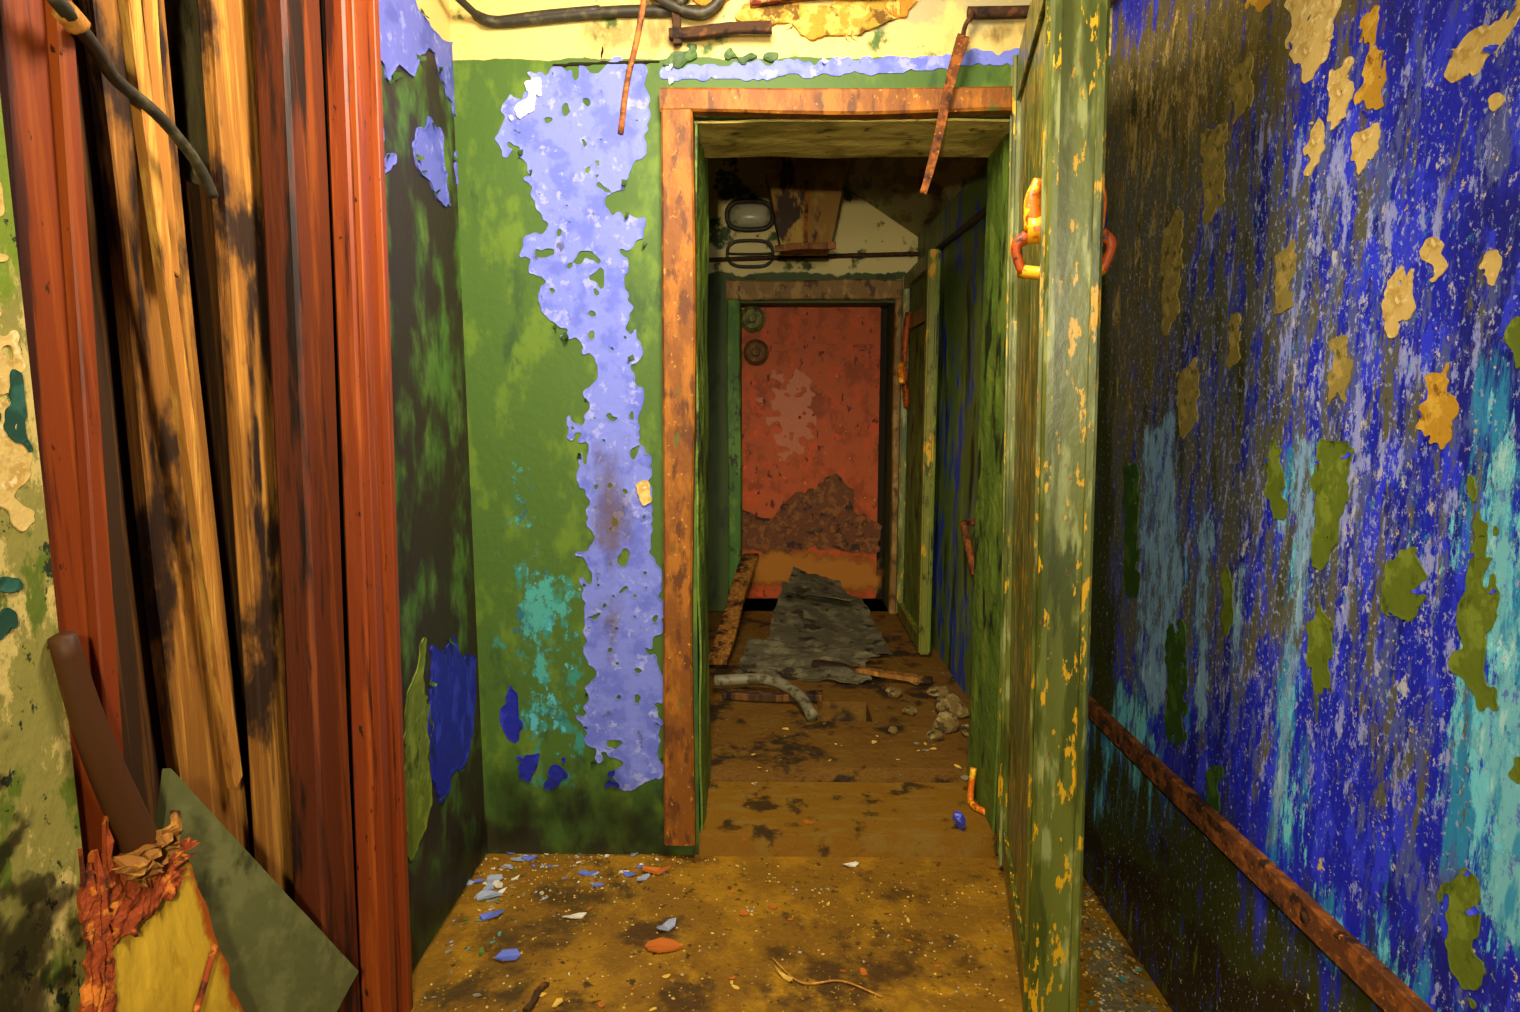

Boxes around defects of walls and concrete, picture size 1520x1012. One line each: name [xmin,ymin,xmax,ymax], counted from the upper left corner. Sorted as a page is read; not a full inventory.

peeling [1243,0,1387,176]
peeling [1444,0,1520,83]
peeling [1381,237,1448,338]
peeling [1479,250,1502,286]
peeling [0,330,35,531]
peeling [495,0,1020,791]
peeling [1416,362,1459,450]
peeling [1306,438,1354,572]
peeling [1306,605,1334,694]
peeling [1380,546,1428,622]
peeling [1449,475,1501,712]
peeling [1437,867,1486,1009]